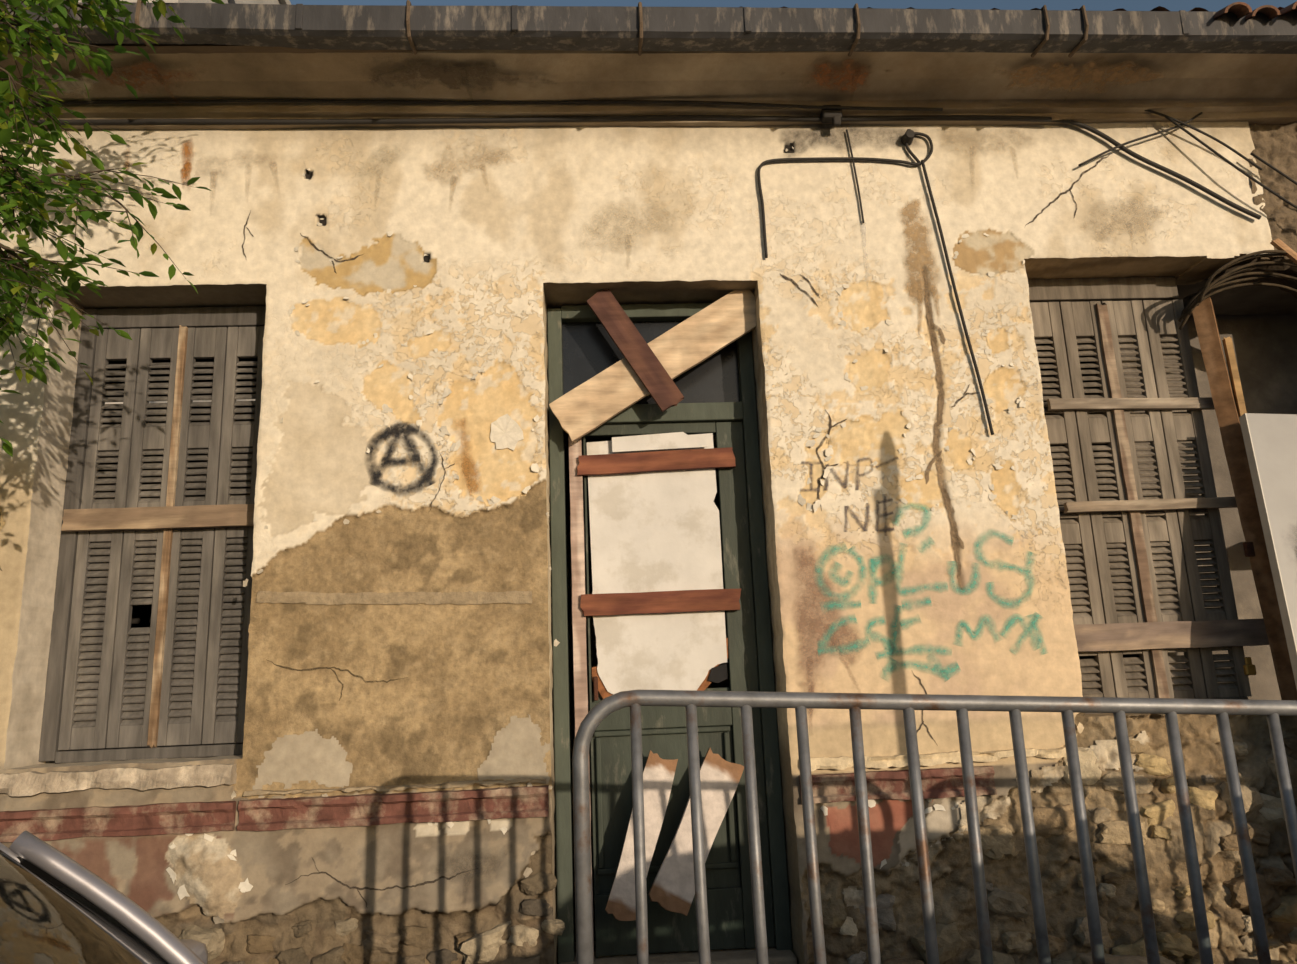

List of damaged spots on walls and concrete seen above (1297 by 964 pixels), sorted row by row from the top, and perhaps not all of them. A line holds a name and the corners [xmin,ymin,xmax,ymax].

spalling [289,231,436,347]
water stain [902,201,938,316]
spalling [953,229,1033,277]
peeling [981,328,1026,414]
peeling [798,407,911,513]
peeling [895,472,942,511]
flaking render [231,329,588,799]
crack [267,660,403,700]
spalling [416,821,469,836]
spalling [487,819,511,834]
flaking render [156,832,566,964]
crack [285,868,478,907]